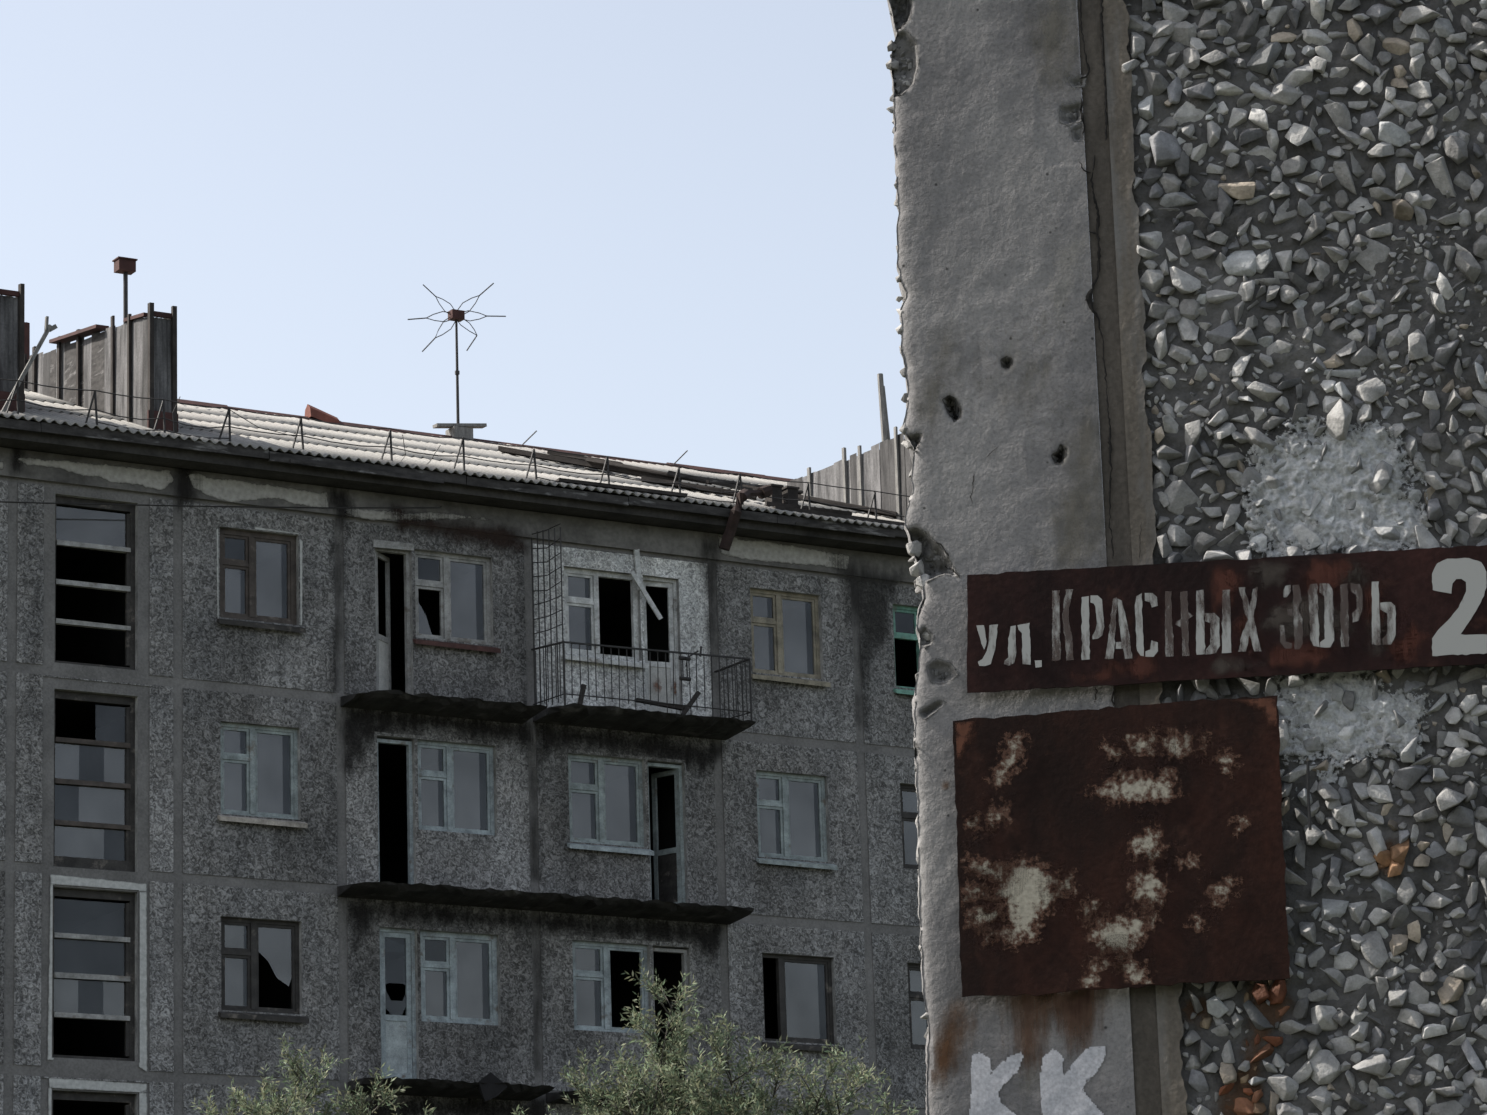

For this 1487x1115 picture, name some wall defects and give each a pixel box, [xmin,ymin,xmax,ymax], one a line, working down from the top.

spalling [889,0,920,95]
crack [1079,0,1142,558]
spalling [909,527,959,720]
rust [931,1007,963,1082]